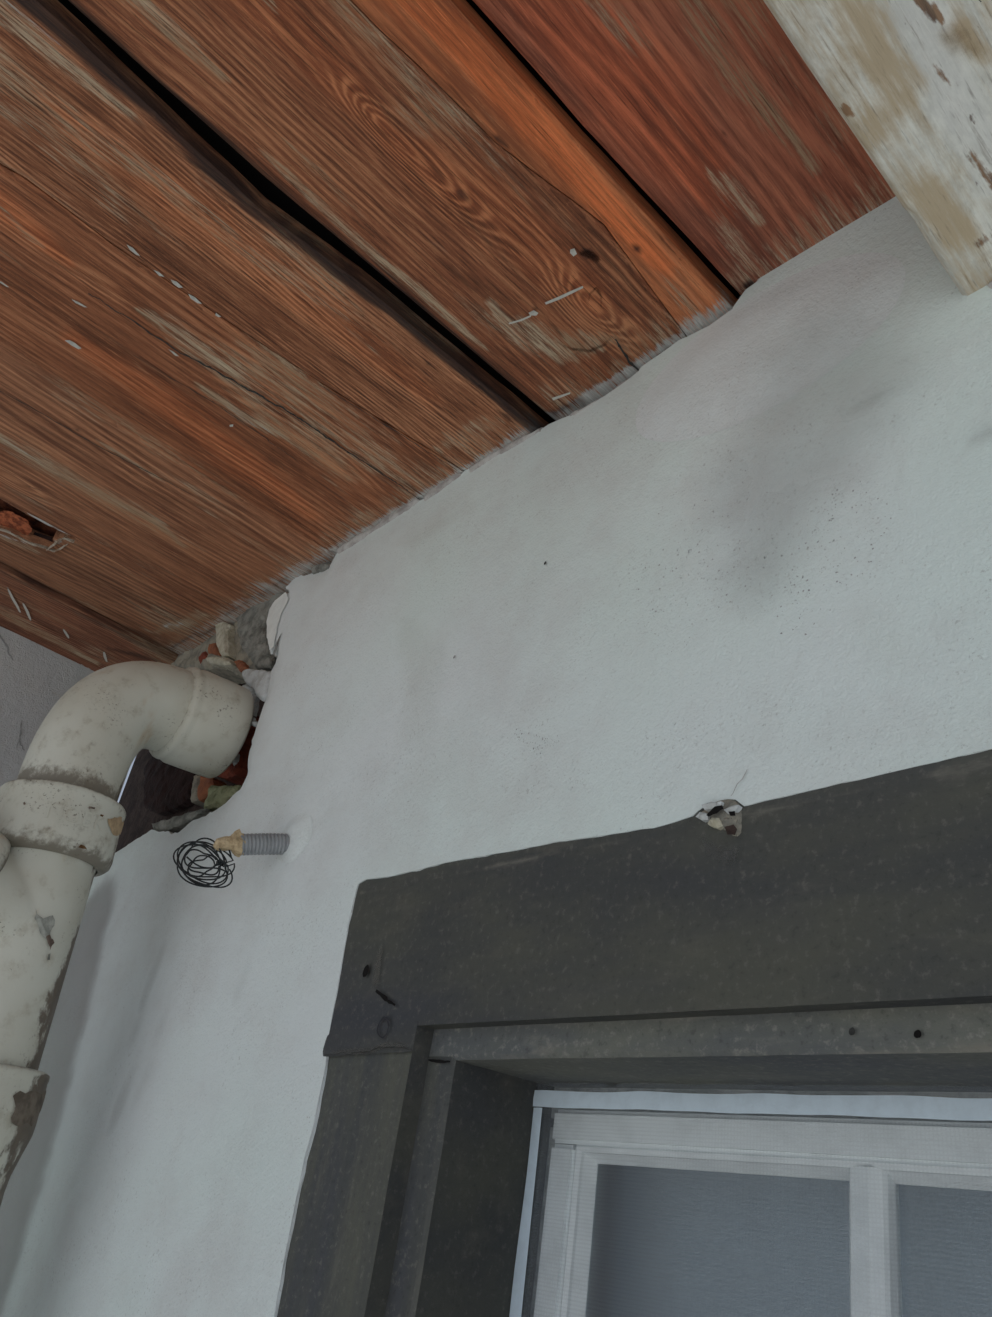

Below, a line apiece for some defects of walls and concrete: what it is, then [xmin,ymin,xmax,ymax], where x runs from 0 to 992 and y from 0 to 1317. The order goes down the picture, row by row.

flaking render [144,592,289,833]
flaking render [696,799,742,837]